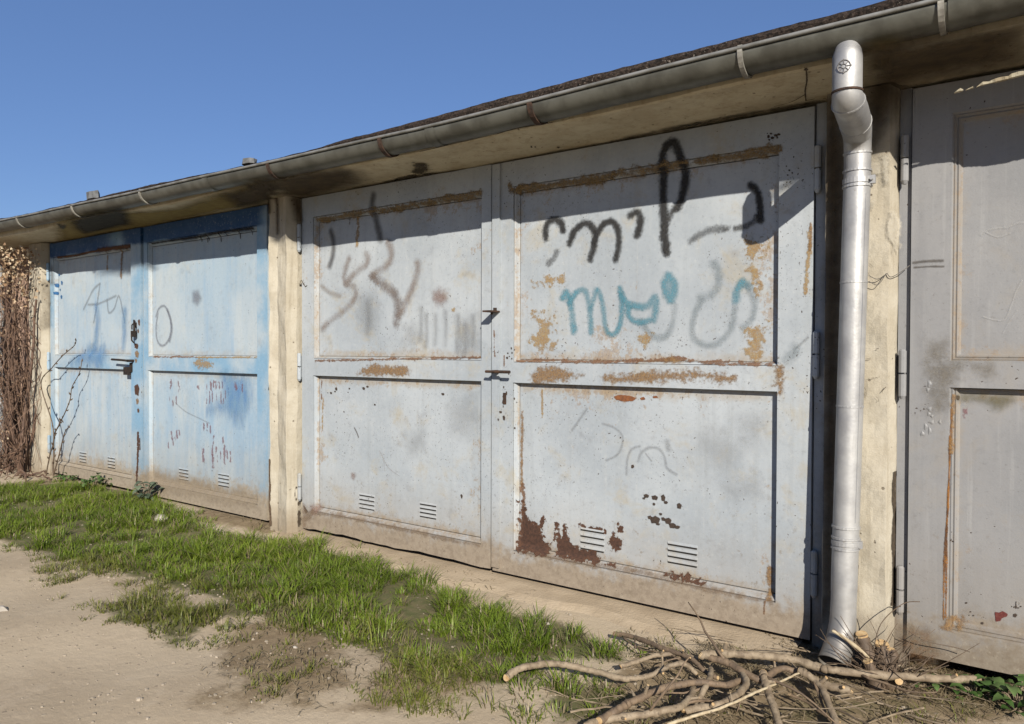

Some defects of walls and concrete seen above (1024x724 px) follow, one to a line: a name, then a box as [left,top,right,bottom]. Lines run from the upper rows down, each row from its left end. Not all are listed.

rust [508,142,782,196]
rust [316,188,482,247]
rust [531,274,565,288]
rust [744,235,770,296]
rust [315,356,481,376]
rust [493,310,784,416]
rust [941,395,964,631]
peeling [965,601,1022,624]